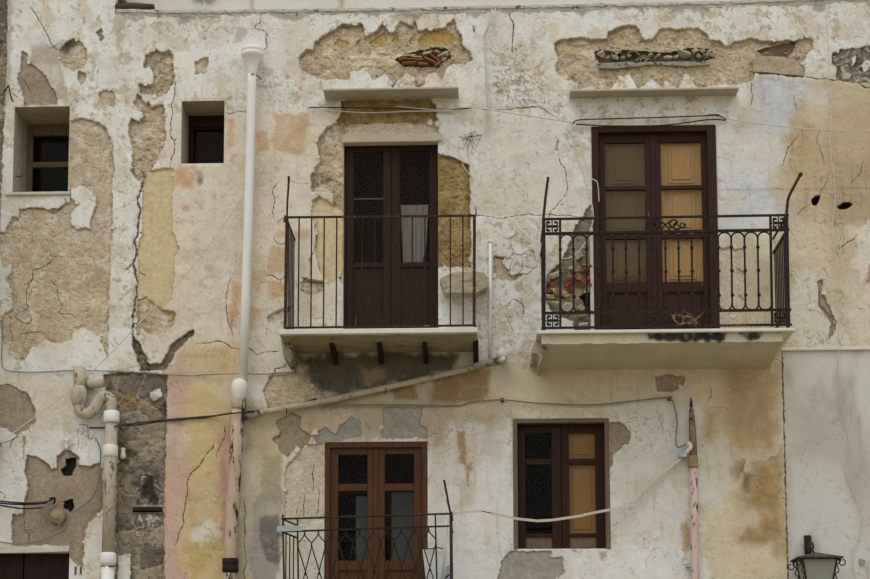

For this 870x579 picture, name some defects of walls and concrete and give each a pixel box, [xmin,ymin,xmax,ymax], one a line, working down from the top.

spalling [300,20,471,87]
spalling [555,27,812,89]
spalling [832,46,870,83]
peeling [0,120,116,361]
crack [126,170,148,364]
peeling [130,47,179,336]
spalling [299,99,441,295]
flaking render [438,155,473,270]
peeling [13,450,104,566]
flaking render [104,374,168,579]
crack [175,426,226,545]
peeling [264,374,361,533]